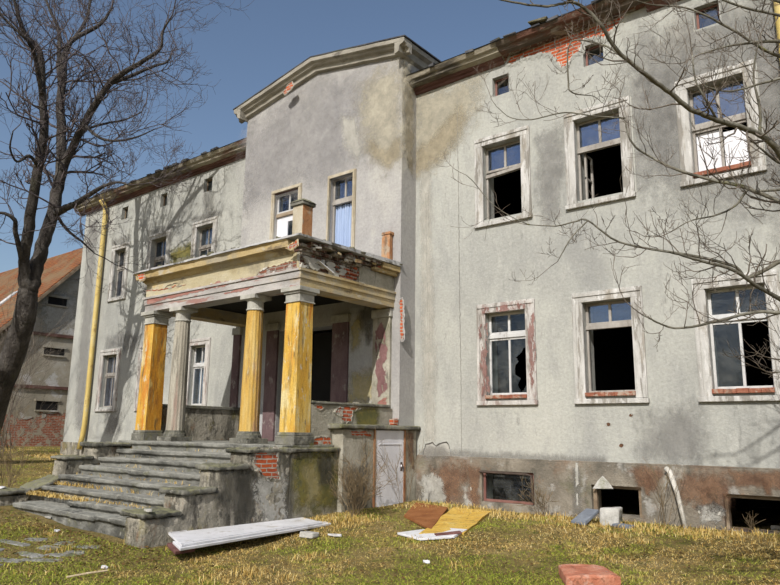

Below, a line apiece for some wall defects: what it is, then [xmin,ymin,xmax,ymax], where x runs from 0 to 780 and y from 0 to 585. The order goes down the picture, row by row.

flaking render [504,13,629,72]
spalling [147,239,381,304]
water stain [252,62,479,439]
peeling [375,323,388,405]
peeling [479,303,536,395]
flaking render [0,409,66,446]
flaking render [314,402,374,438]
flaking render [250,446,288,522]